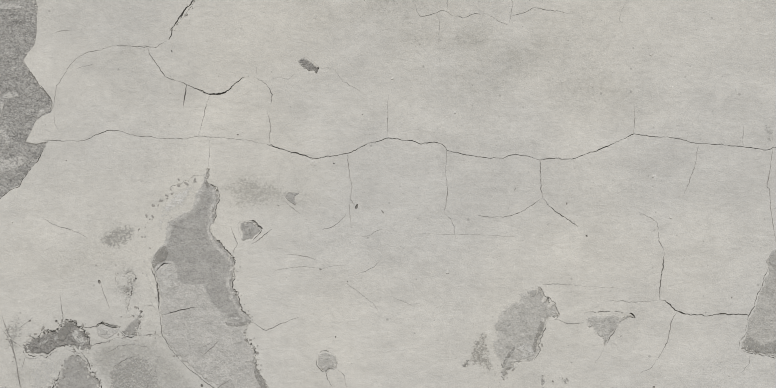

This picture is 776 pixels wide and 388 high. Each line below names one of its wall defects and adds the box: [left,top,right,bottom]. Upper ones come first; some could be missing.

spalling [0,0,52,199]
spalling [295,55,319,74]
crack [46,0,776,249]
spalling [12,306,144,388]
crack [48,263,214,388]
peeling [149,168,269,388]
spalling [316,350,338,373]
spalling [487,286,560,382]
spalling [583,311,635,347]
crack [611,214,749,372]
spalling [739,247,776,358]